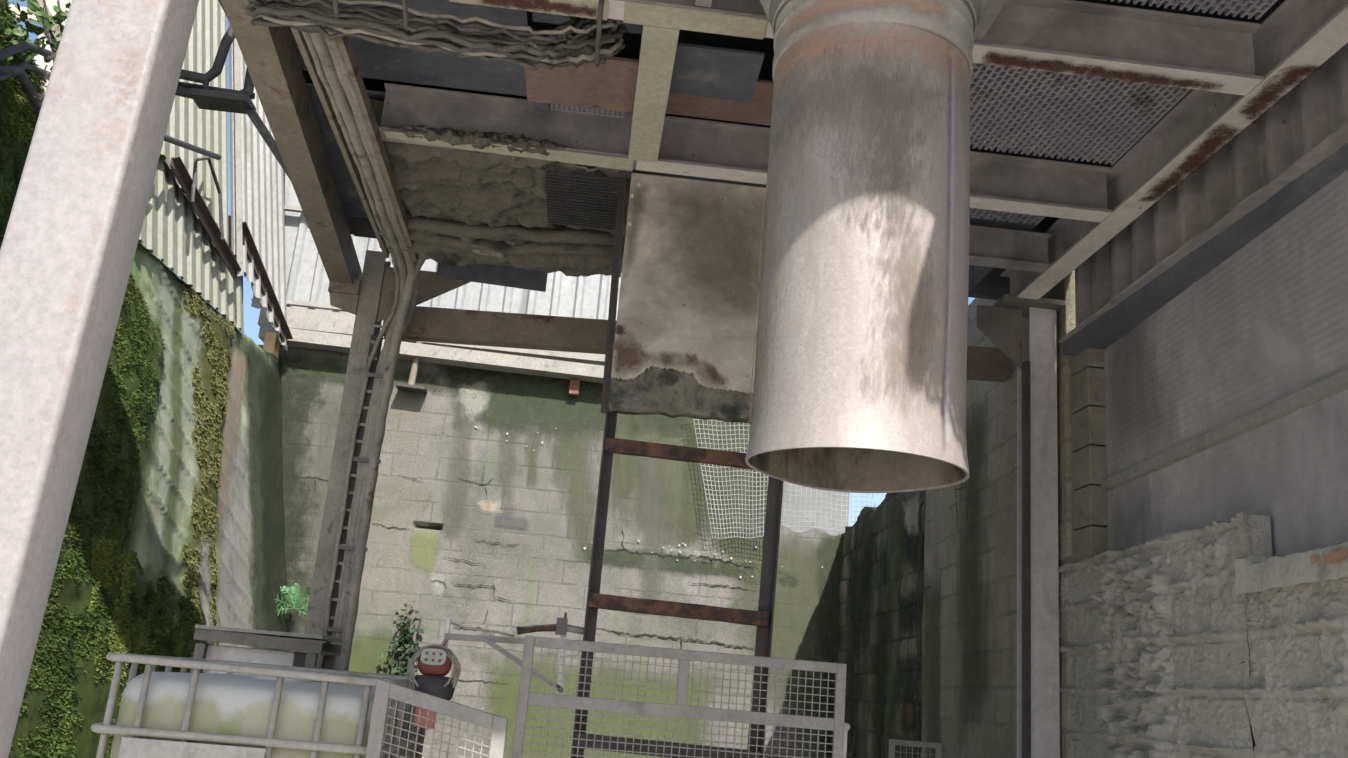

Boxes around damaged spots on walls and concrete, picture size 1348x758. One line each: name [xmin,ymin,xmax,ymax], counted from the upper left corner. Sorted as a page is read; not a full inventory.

corrosion [981,53,1222,90]
corrosion [1141,67,1318,202]
leakage [946,51,955,420]
leakage [129,262,251,606]
leakage [281,356,347,383]
leakage [394,371,436,388]
leakage [447,386,484,534]
corrosion [615,325,643,370]
corrosion [664,355,722,383]
leakage [199,424,255,648]
leakage [845,533,918,758]